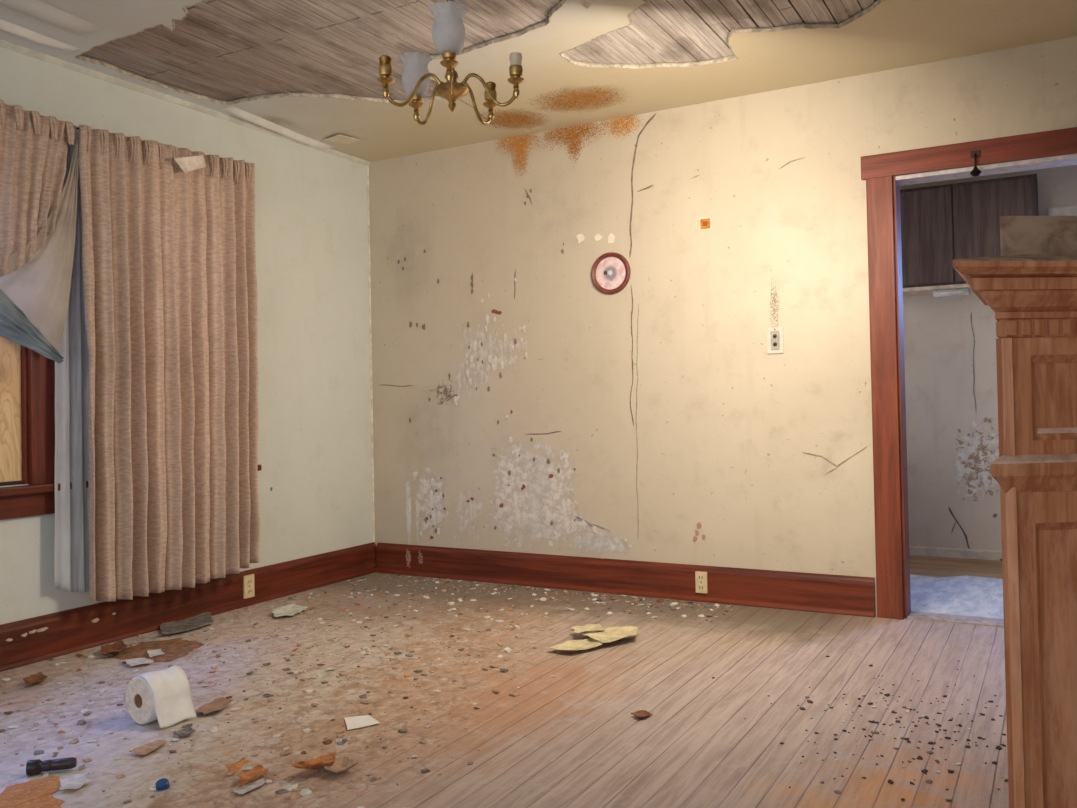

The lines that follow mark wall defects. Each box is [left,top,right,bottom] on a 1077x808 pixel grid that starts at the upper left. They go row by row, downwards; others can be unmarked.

flaking render [75,0,595,105]
flaking render [559,0,886,69]
corrosion [481,85,644,179]
crack [629,113,656,256]
peeling [429,275,530,405]
peeling [411,437,632,558]
crack [630,287,639,532]
peeling [953,417,999,503]